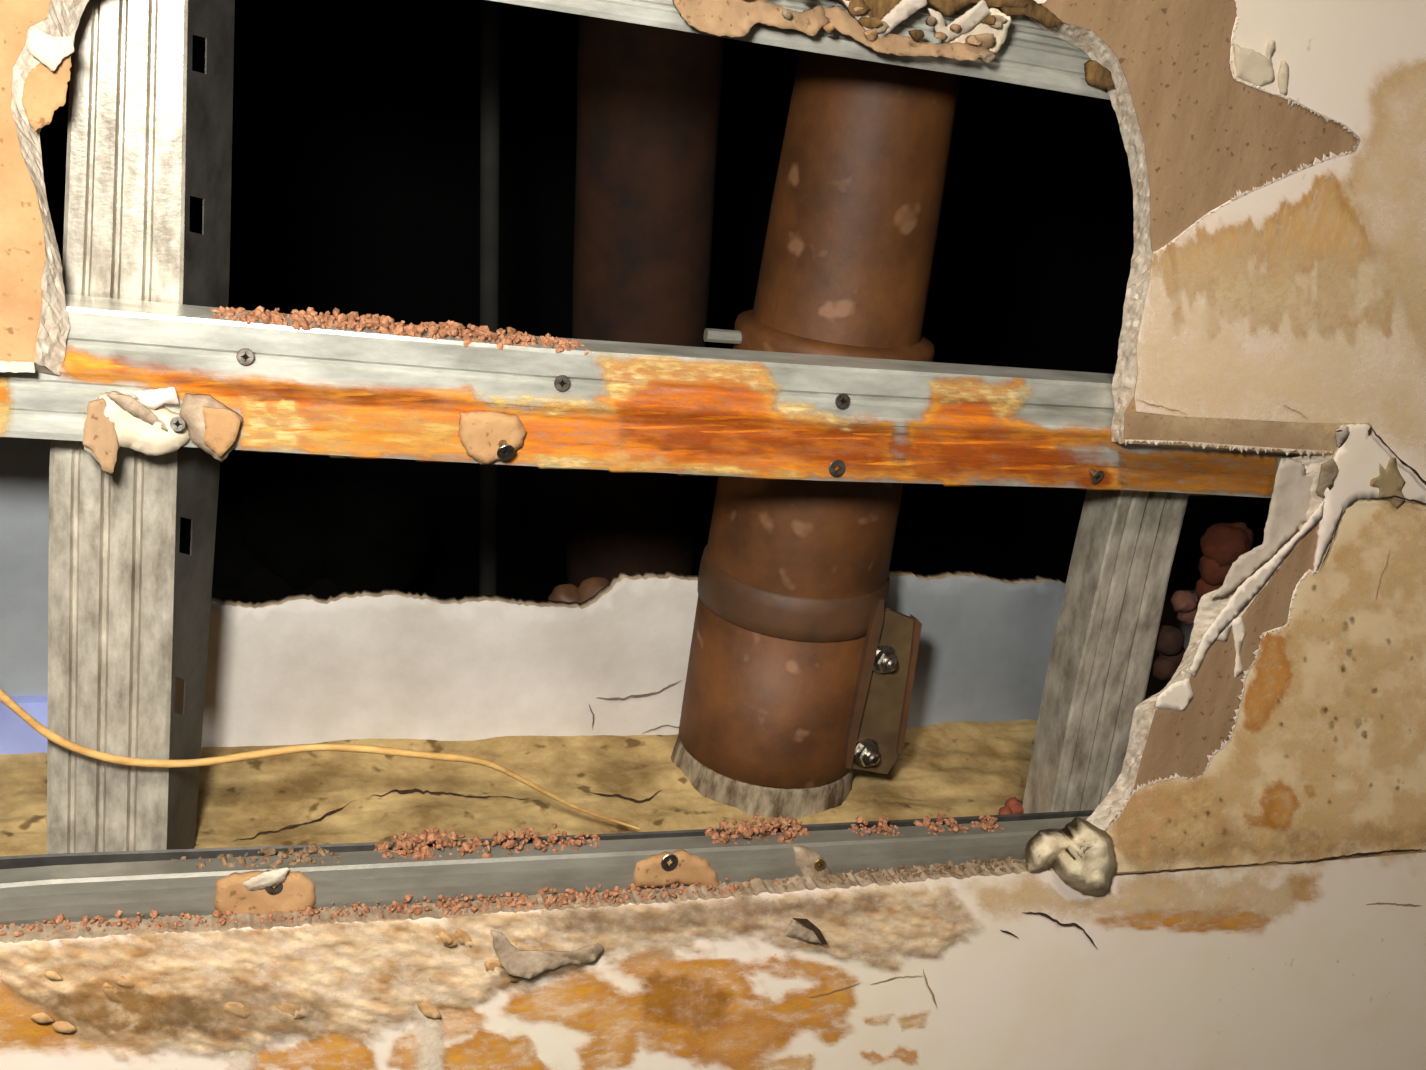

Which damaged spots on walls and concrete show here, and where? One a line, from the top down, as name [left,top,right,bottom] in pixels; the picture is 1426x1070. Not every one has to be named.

water stain [1141,62,1426,440]
corrosion [0,376,10,433]
peeling [133,387,179,409]
corrosion [63,349,1276,495]
water stain [980,505,1426,932]
crack [1001,912,1098,950]
water stain [0,954,203,1055]
water stain [251,1031,418,1070]
water stain [436,1002,545,1070]
water stain [505,950,856,1070]
water stain [863,1049,916,1063]
water stain [865,1014,922,1028]